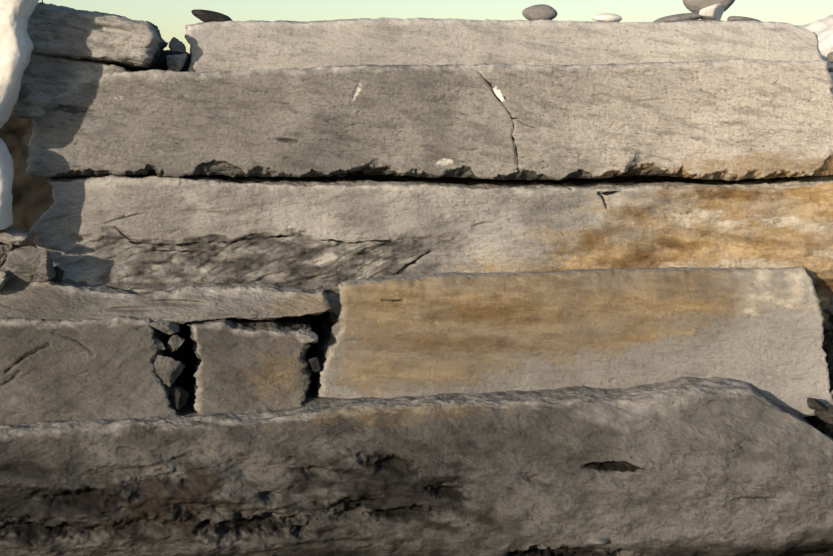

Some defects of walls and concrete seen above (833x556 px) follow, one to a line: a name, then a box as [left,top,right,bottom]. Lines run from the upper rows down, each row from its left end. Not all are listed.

crack [481,75,533,170]
crack [396,251,431,274]